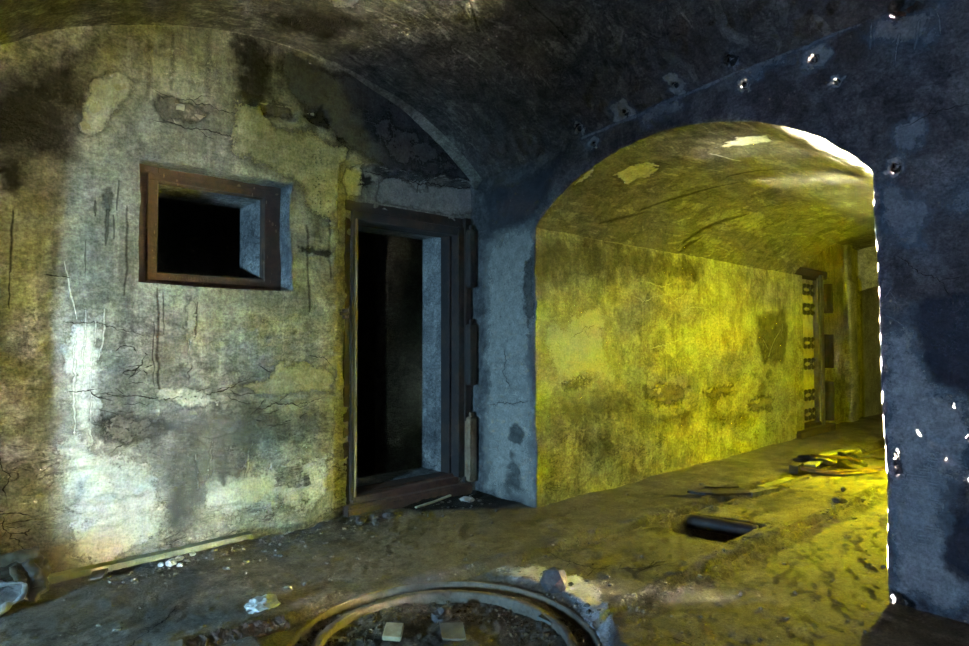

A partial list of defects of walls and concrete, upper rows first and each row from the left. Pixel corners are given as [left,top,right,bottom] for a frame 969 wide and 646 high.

spalling [153,95,210,125]
crack [63,321,326,453]